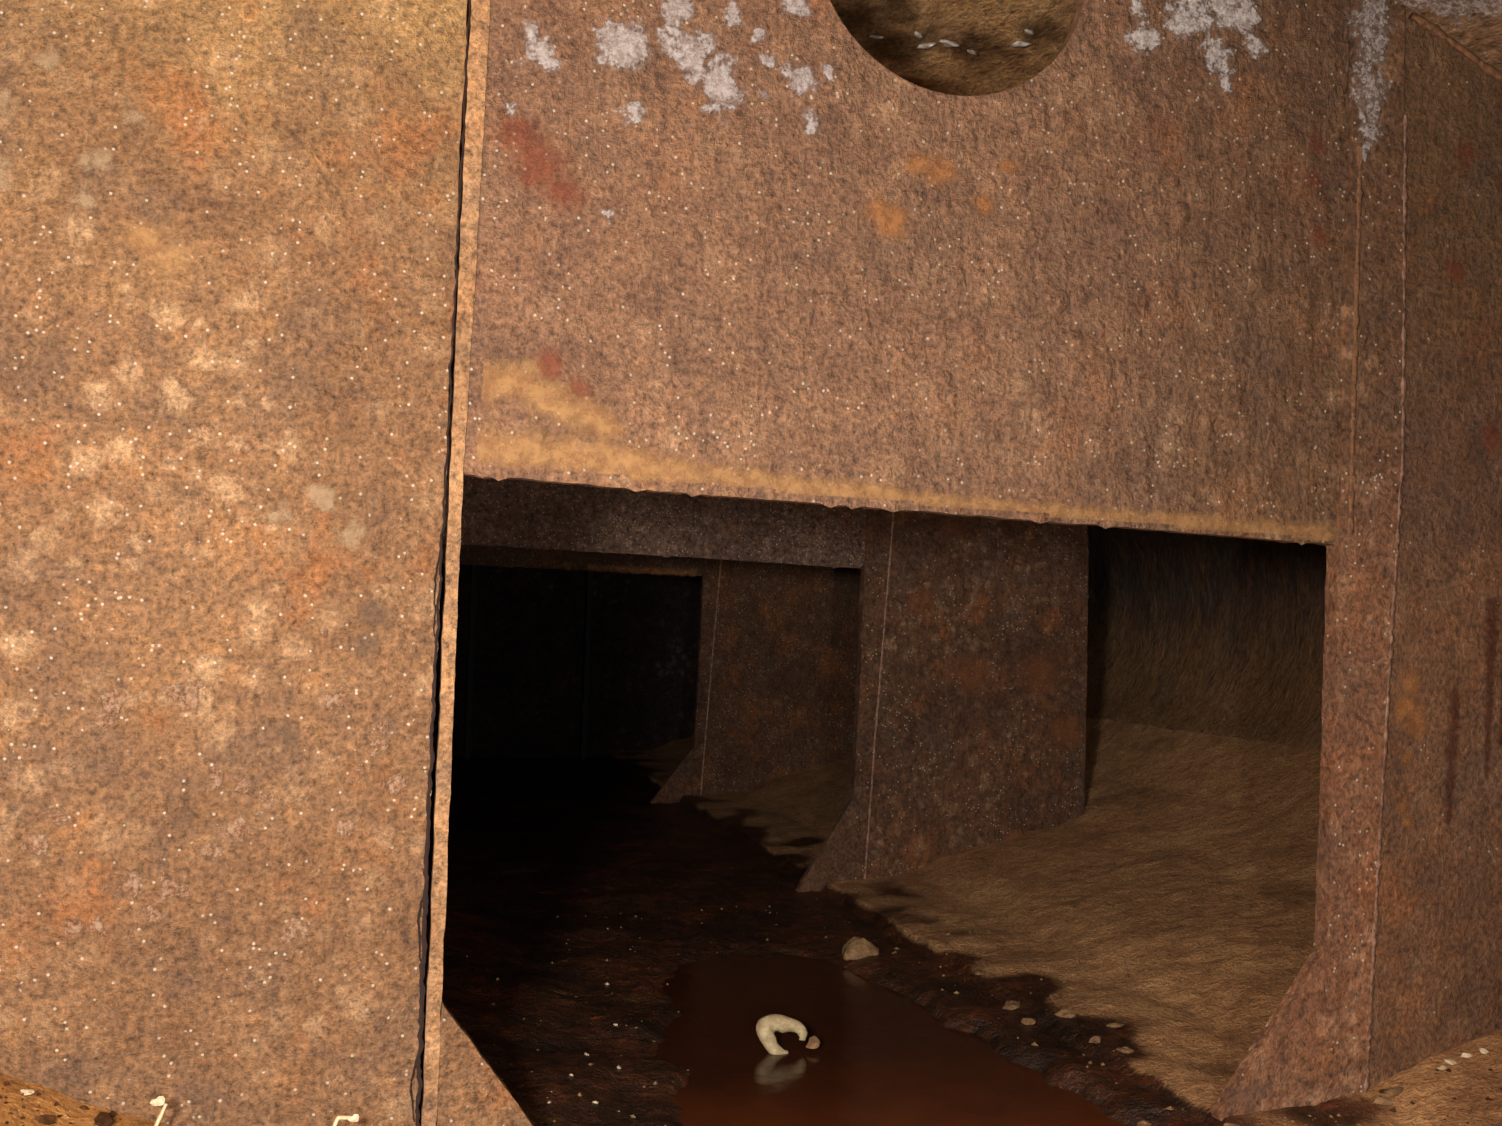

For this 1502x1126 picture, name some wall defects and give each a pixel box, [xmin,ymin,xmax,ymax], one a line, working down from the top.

leakage [521,21,560,72]
leakage [592,0,834,135]
leakage [1125,0,1268,92]
leakage [1347,0,1502,162]